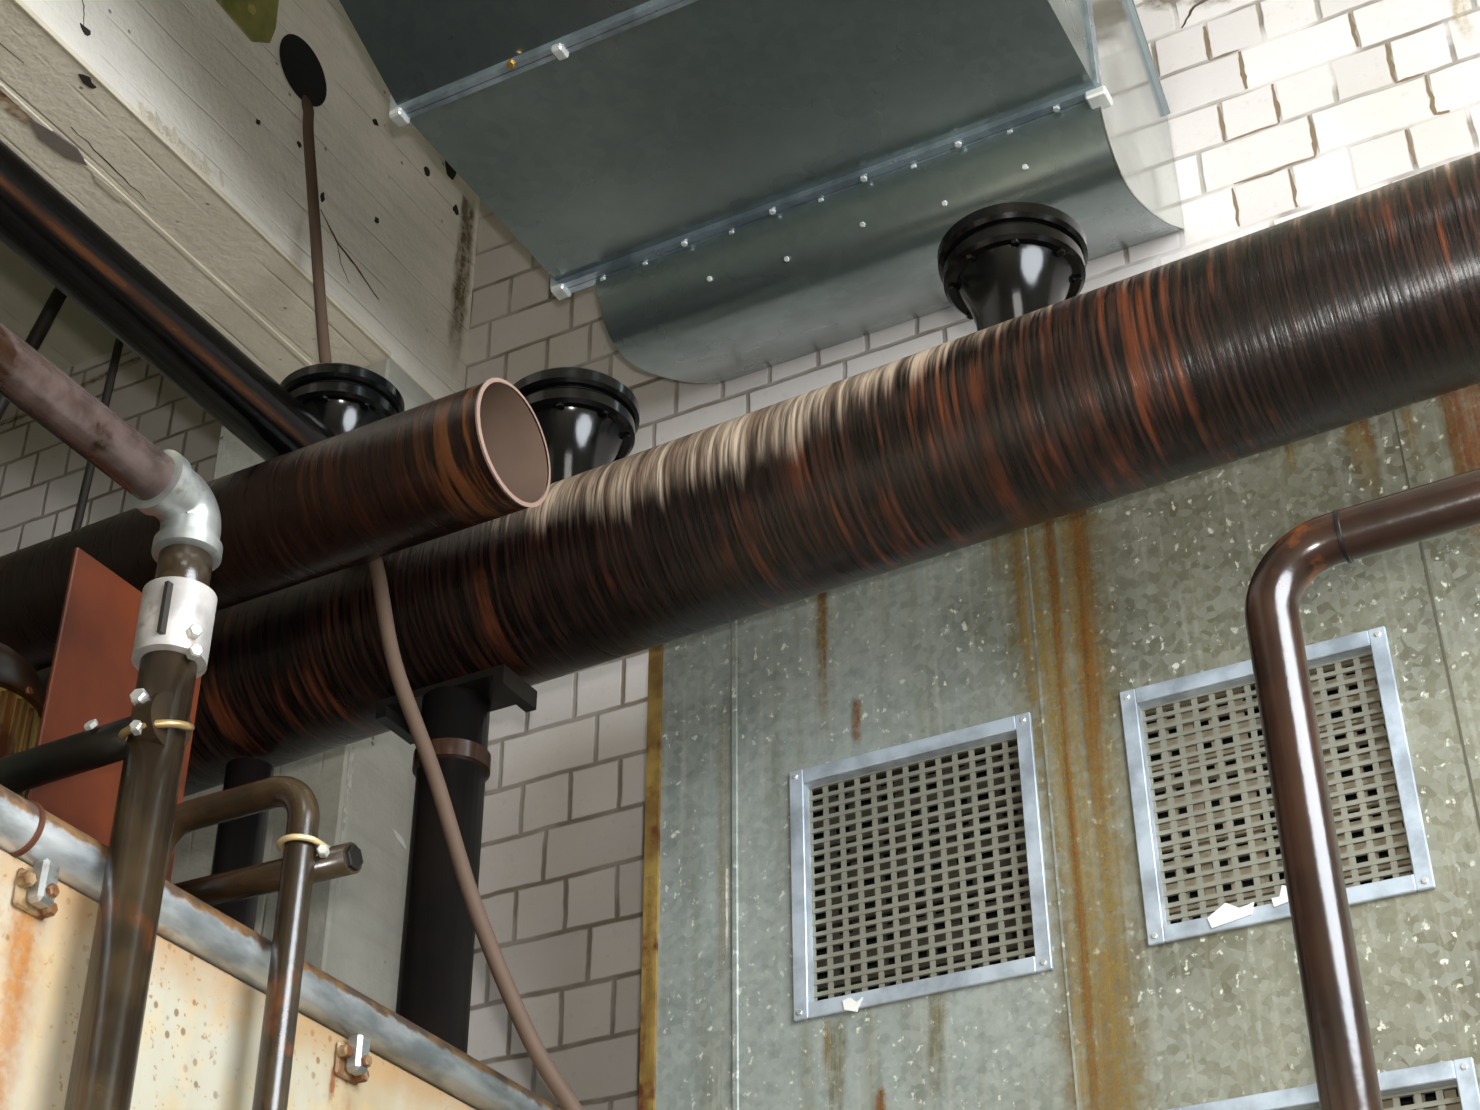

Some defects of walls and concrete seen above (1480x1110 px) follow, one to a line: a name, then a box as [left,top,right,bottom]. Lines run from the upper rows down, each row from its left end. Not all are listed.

peeling [216,0,279,43]
damp [454,198,474,331]
corrosion [1440,383,1480,474]
corrosion [818,592,827,653]
corrosion [992,509,1139,1110]